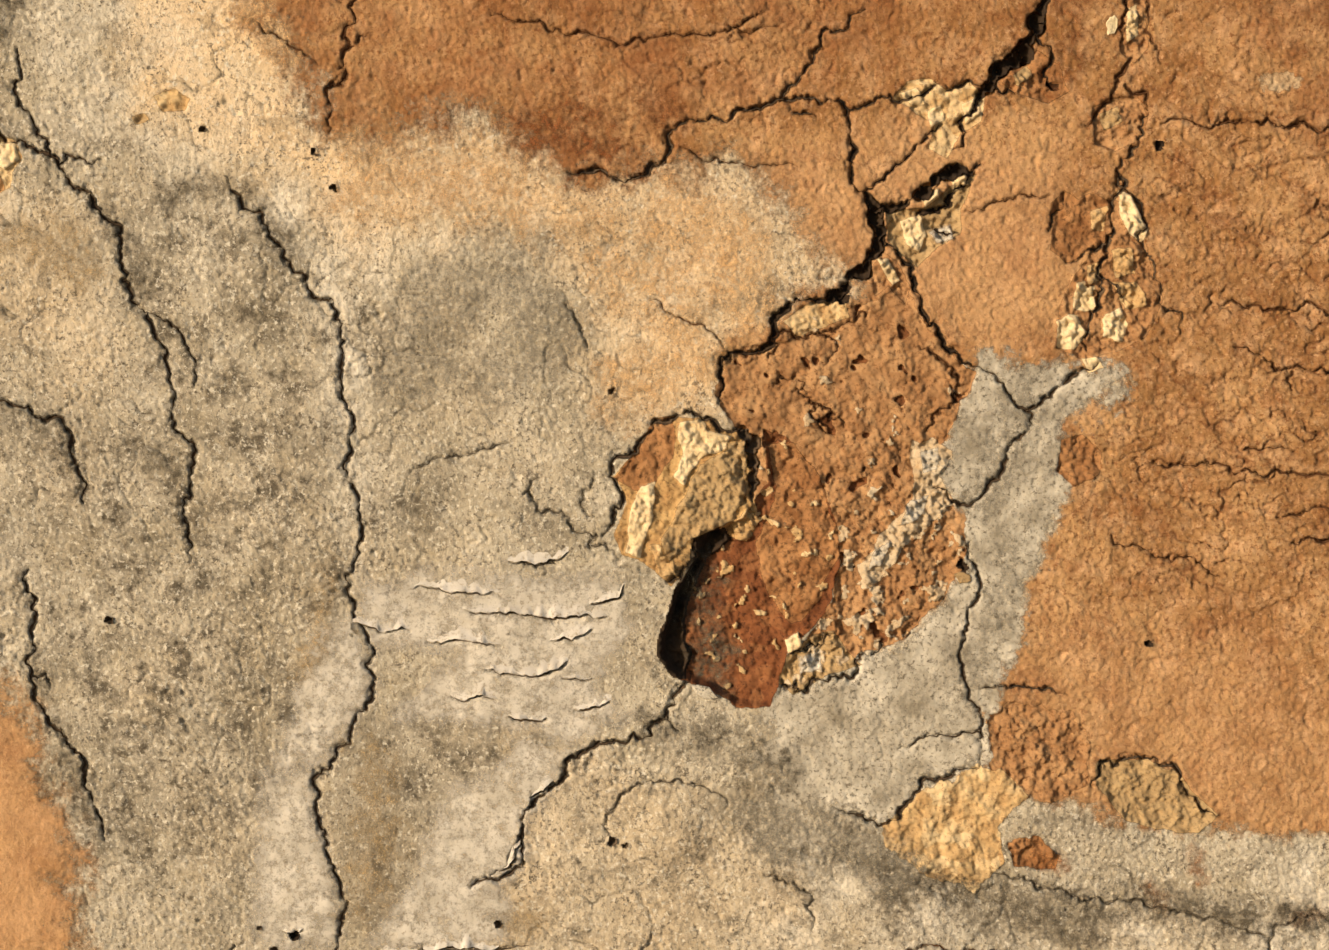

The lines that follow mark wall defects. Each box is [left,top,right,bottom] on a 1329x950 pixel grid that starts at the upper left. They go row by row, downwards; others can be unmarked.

spalling [0,137,22,193]
spalling [1092,97,1148,151]
crack [0,52,197,558]
crack [491,0,1329,555]
spalling [1050,190,1163,373]
spalling [613,174,976,708]
crack [227,177,376,950]
flaking render [413,578,626,702]
crack [471,671,691,887]
crack [780,634,882,694]
crack [838,542,1066,827]
spalling [881,701,1218,893]